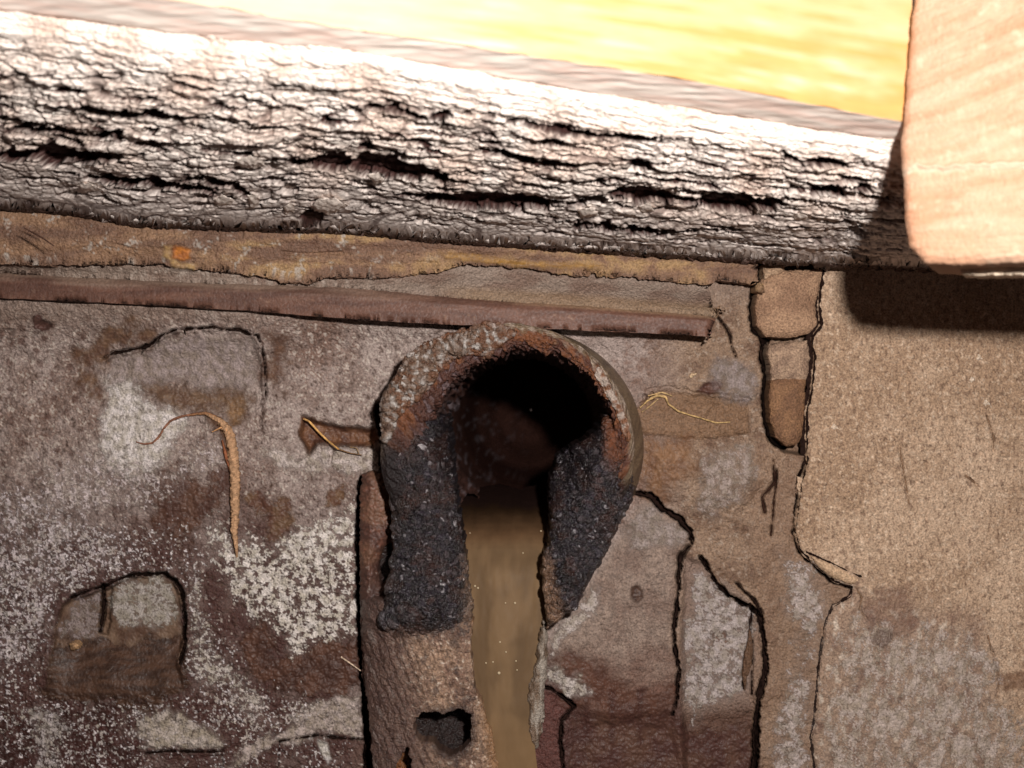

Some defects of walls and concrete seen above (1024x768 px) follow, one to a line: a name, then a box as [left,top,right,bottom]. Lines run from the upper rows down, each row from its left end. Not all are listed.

corrosion [163,246,196,269]
crack [104,326,267,396]
corrosion [0,273,725,400]
water stain [0,337,381,768]
crack [635,491,769,768]
crack [718,263,865,768]